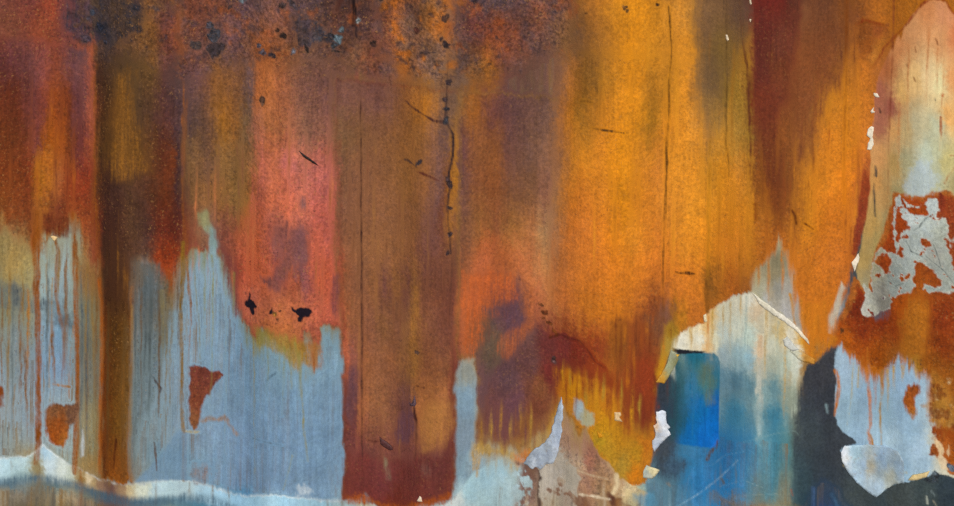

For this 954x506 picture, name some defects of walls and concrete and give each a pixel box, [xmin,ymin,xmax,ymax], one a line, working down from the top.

corrosion [0,0,461,506]
corrosion [440,0,954,487]
peeling [673,293,806,444]
peeling [0,443,337,506]
peeling [449,431,660,506]